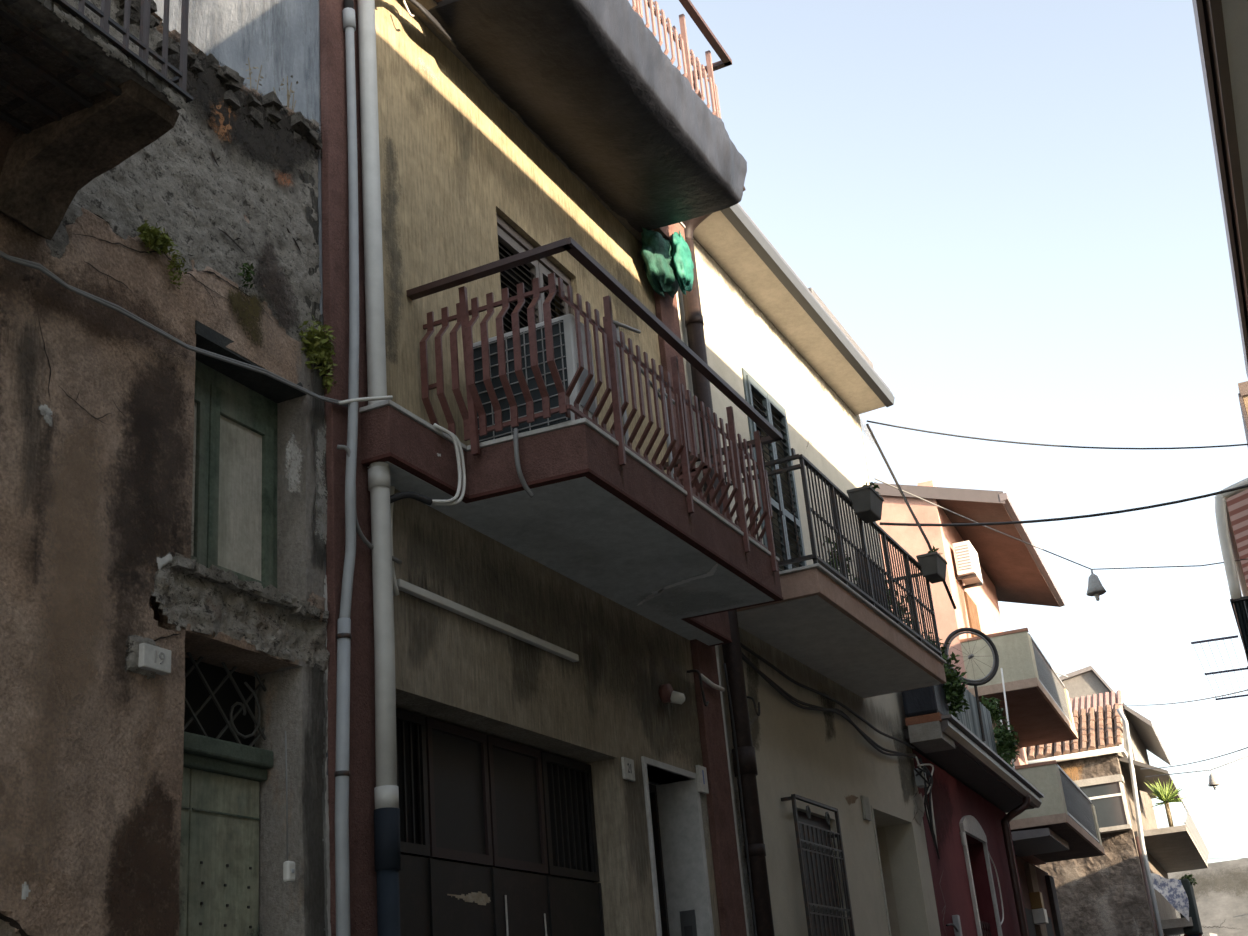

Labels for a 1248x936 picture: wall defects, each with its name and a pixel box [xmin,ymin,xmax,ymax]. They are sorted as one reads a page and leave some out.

flaking render [45,0,321,341]
damp [0,234,193,701]
spalling [156,552,329,648]
spalling [0,919,21,936]
crack [0,913,30,936]
peeling [21,882,31,899]
damp [103,770,182,936]
peeling [322,667,331,936]